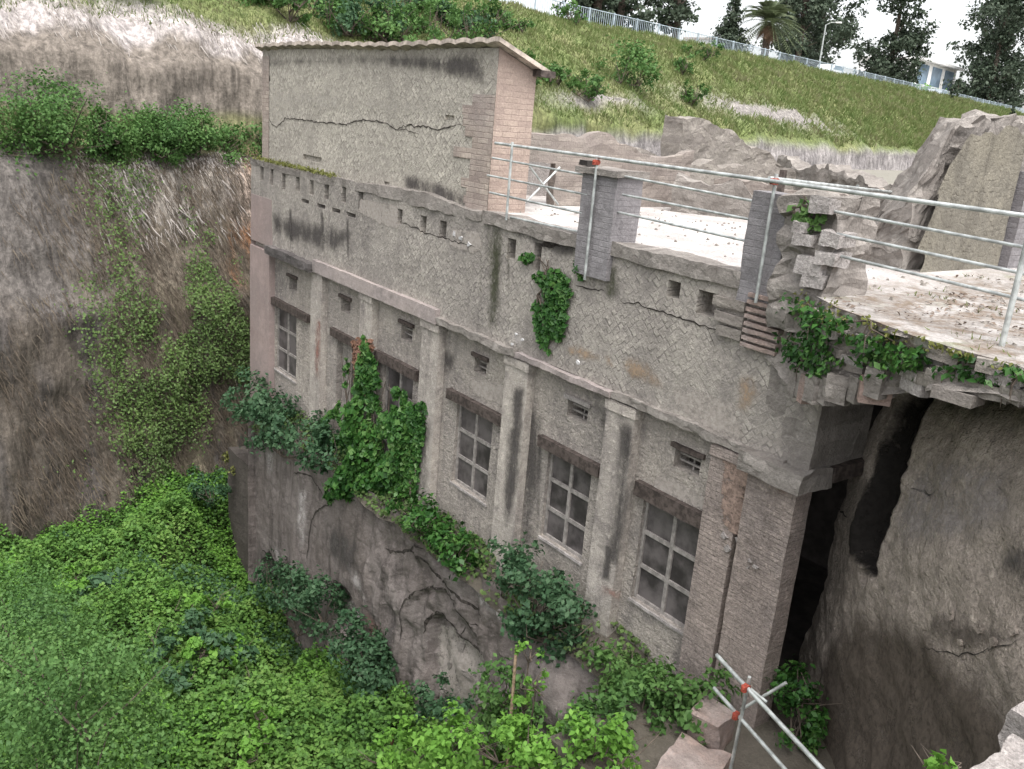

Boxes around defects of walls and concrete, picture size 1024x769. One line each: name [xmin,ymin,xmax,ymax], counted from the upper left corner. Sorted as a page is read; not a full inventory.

water stain [390,58,479,77]
crack [269,118,461,134]
water stain [274,210,348,251]
crack [576,285,716,344]
crack [293,472,328,557]
water stain [505,389,540,539]
water stain [603,426,632,578]
crack [386,544,482,655]